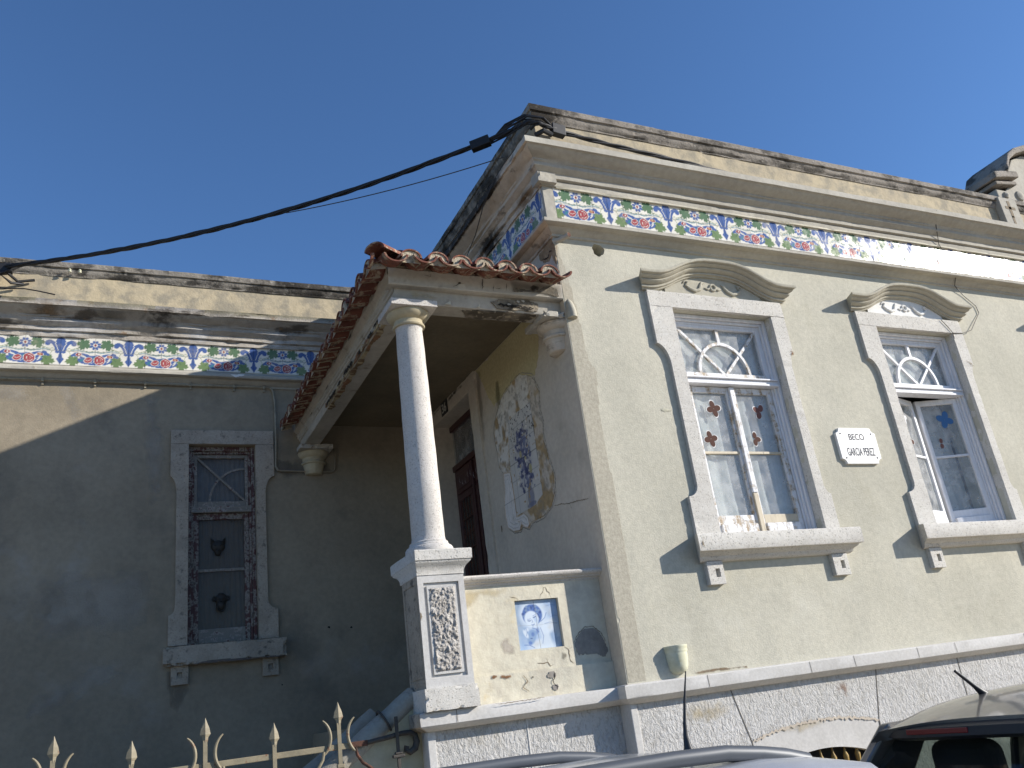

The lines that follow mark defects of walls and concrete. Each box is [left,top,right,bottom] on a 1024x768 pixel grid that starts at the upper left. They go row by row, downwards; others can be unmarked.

water stain [528,103,561,124]
water stain [444,176,499,257]
water stain [39,304,55,316]
water stain [276,282,338,299]
spalling [461,286,559,323]
peeling [493,372,556,534]